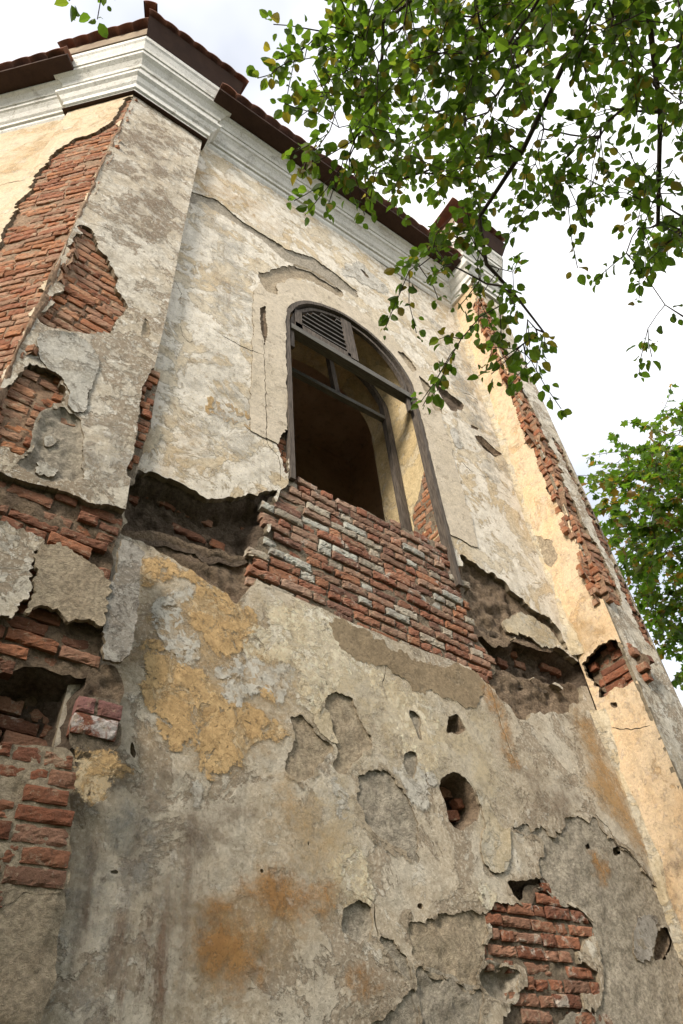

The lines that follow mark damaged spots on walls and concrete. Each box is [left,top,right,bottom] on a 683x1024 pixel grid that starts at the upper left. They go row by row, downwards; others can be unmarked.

flaking render [0,99,138,483]
spalling [0,370,683,1024]
spalling [460,298,655,720]